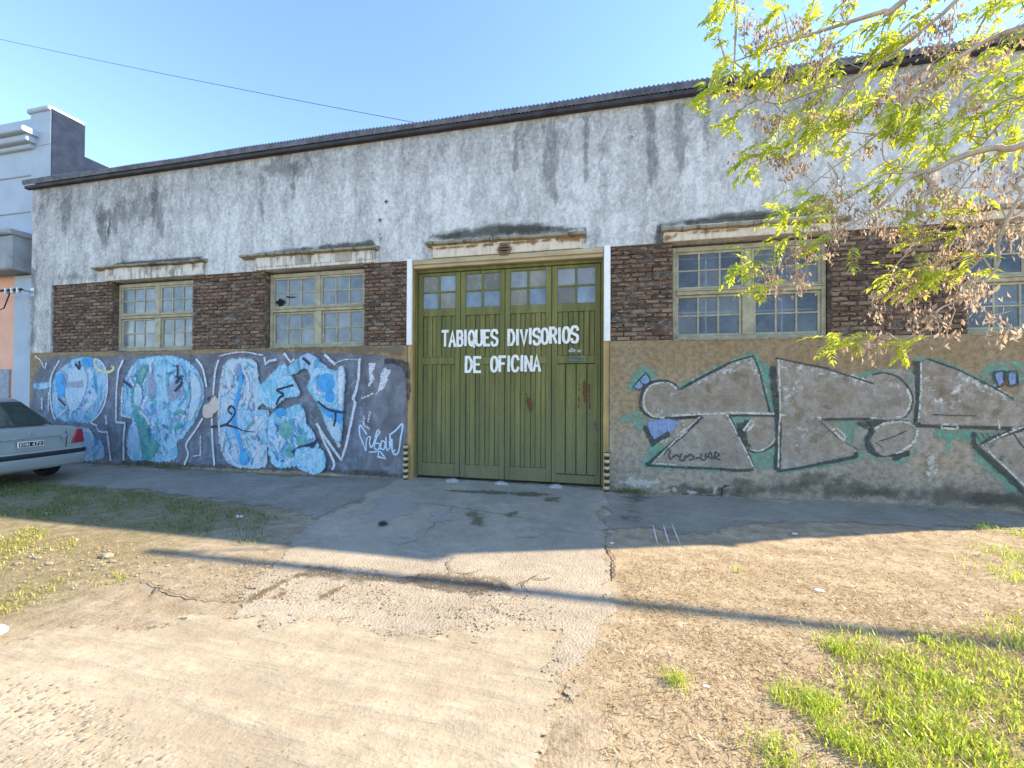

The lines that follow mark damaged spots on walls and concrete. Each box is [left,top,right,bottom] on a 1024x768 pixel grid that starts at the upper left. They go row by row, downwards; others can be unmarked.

crack [605,545,617,580]
crack [122,579,226,600]